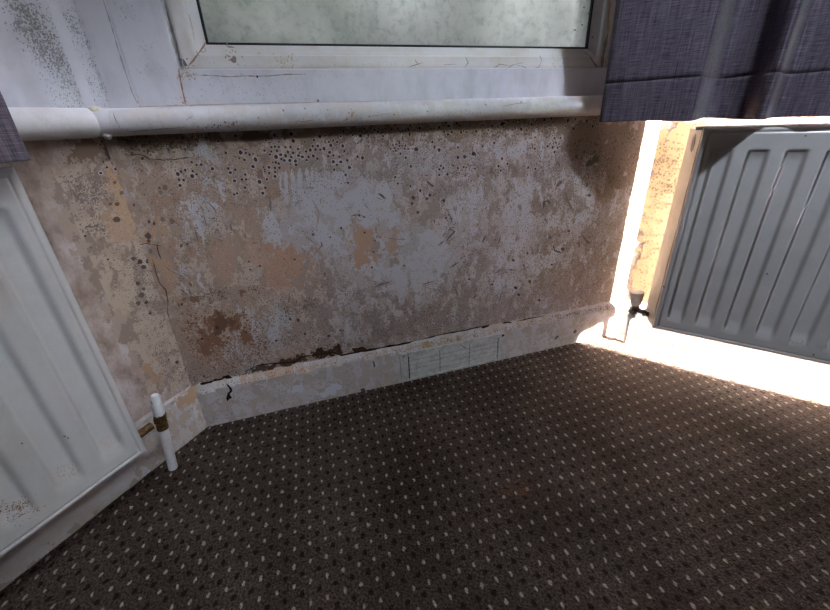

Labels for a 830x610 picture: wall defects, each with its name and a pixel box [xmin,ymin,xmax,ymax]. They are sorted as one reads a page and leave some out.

damp [0,0,84,108]
damp [38,0,709,500]
peeling [216,133,608,379]
crack [200,375,232,401]
crack [249,316,542,370]